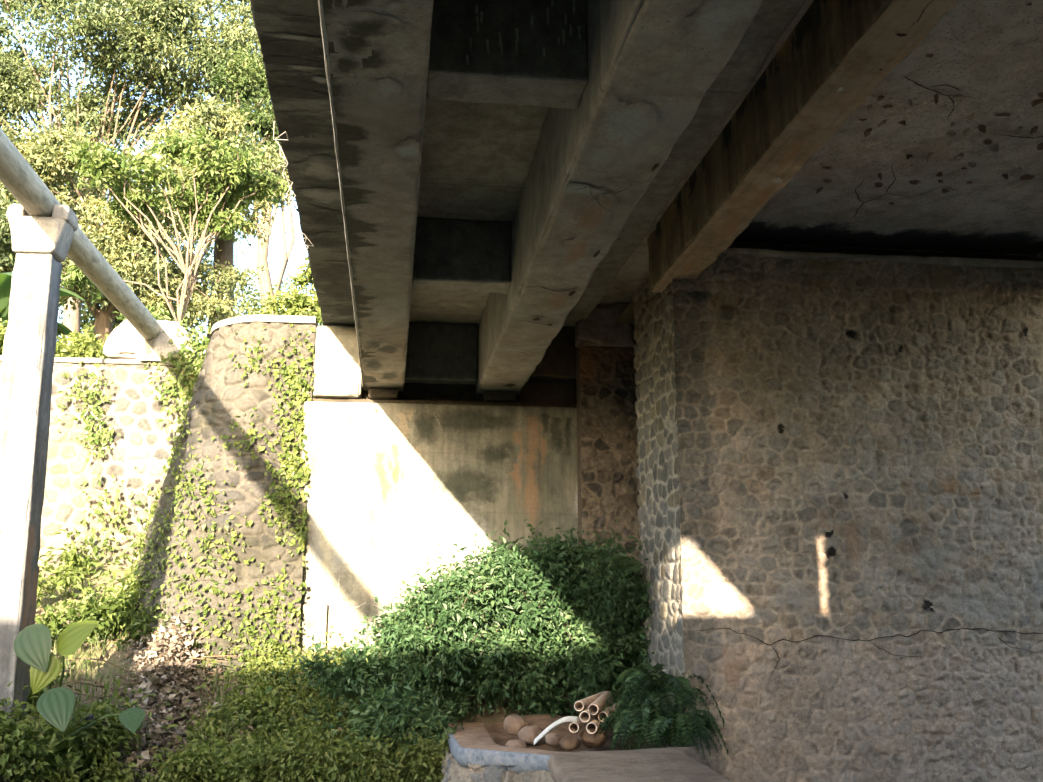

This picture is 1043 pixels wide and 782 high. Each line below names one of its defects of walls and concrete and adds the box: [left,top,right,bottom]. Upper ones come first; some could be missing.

crack [903,75,969,120]
damp [261,0,406,383]
damp [305,458,378,594]
damp [313,403,371,442]
rust [370,429,404,520]
damp [394,405,582,598]
rust [506,411,549,549]
crack [696,628,1043,678]